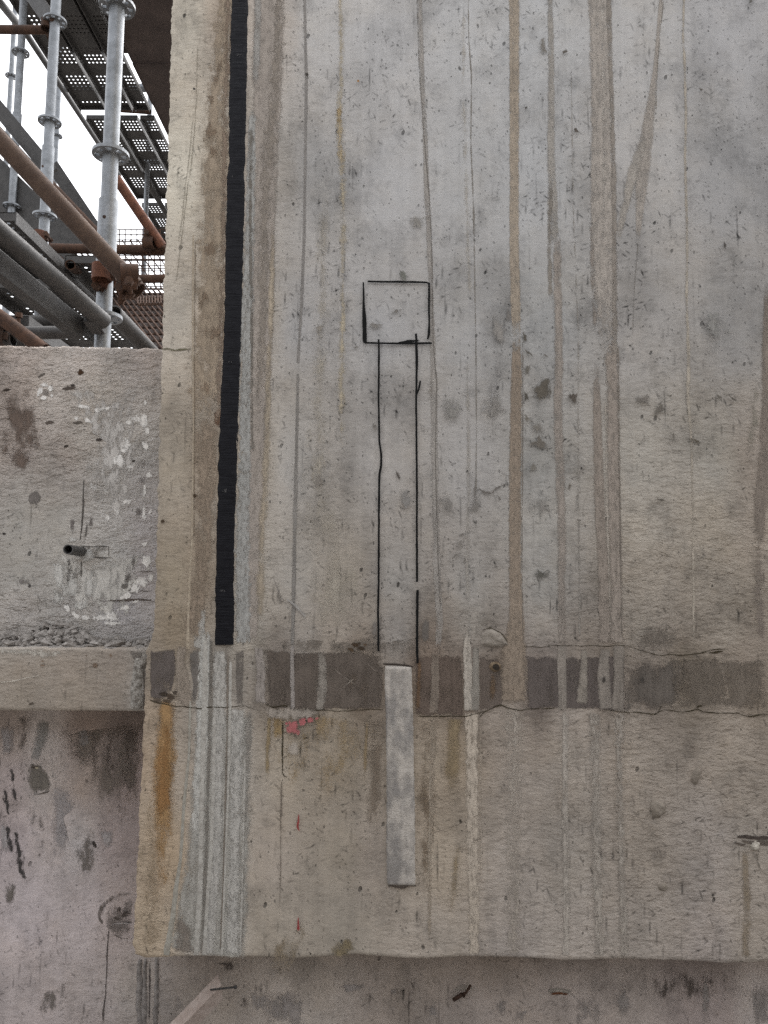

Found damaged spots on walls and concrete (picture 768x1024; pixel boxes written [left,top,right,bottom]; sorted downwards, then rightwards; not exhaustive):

crack [383,661,413,669]
crack [419,705,552,717]
crack [609,705,765,717]
leakage [0,716,48,762]
leakage [63,725,140,812]
leakage [27,765,112,872]
rust [141,702,179,946]